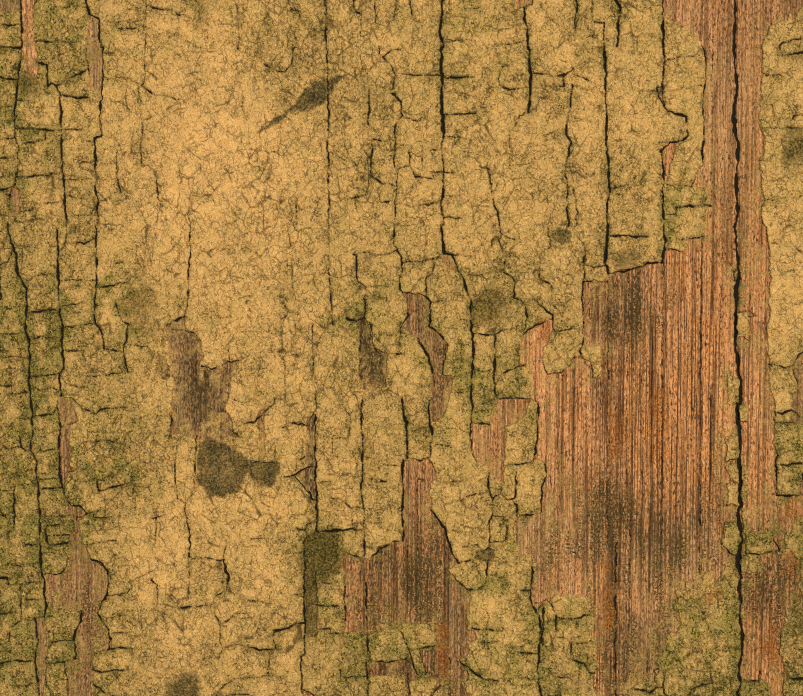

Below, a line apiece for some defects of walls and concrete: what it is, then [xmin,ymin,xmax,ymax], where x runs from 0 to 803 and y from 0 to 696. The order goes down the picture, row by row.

water stain [259,75,345,133]
crack [761,104,803,287]
peeling [31,393,113,696]
water stain [167,675,198,696]
peeling [152,313,242,444]
water stain [196,438,279,496]
peeling [300,456,480,696]
peeling [466,0,803,696]
crack [673,0,780,696]
crack [768,337,803,498]
crack [782,583,803,696]